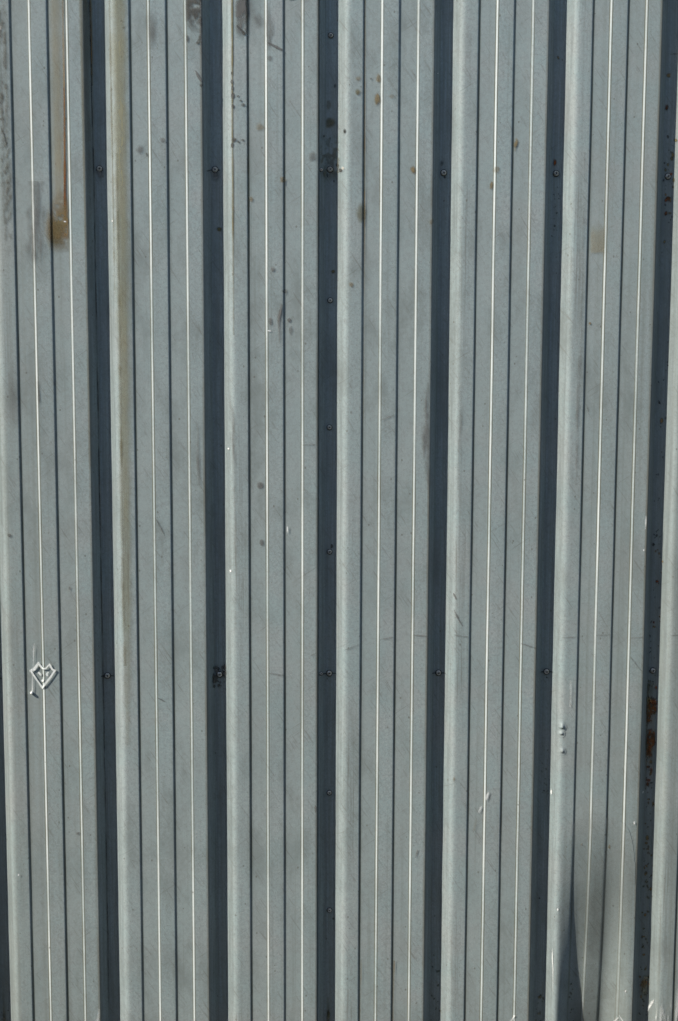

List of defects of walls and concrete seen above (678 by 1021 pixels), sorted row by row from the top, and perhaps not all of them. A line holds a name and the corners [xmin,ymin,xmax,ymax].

rust [51,42,68,243]
rust [643,671,657,899]